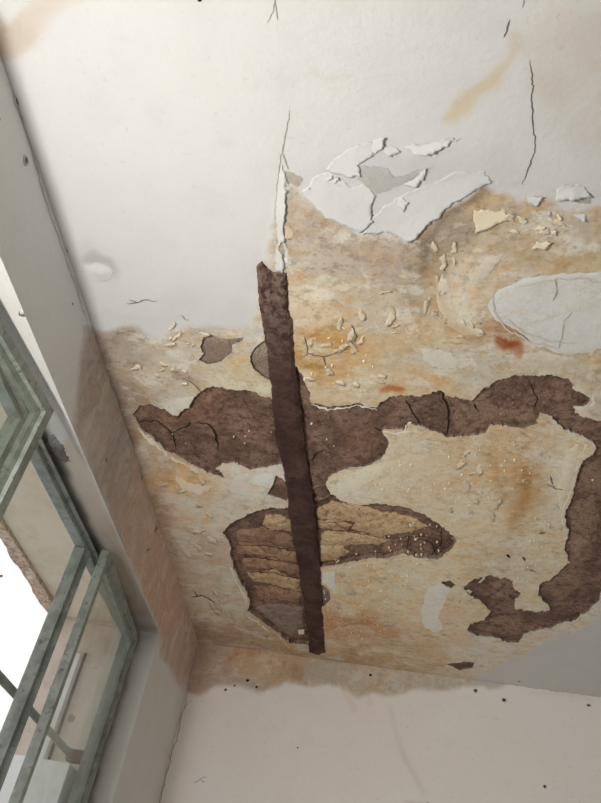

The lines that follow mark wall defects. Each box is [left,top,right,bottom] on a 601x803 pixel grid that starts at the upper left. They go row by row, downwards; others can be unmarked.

crack [522,66,536,182]
peeling [270,138,491,274]
peeling [473,196,566,251]
peeling [556,184,591,222]
flaking render [164,323,243,364]
flaking render [250,341,269,379]
rust [257,264,287,319]
peeling [488,271,601,354]
damp [60,181,601,705]
flaking render [133,386,308,648]
flaking render [296,366,601,643]
flaking render [447,661,474,670]